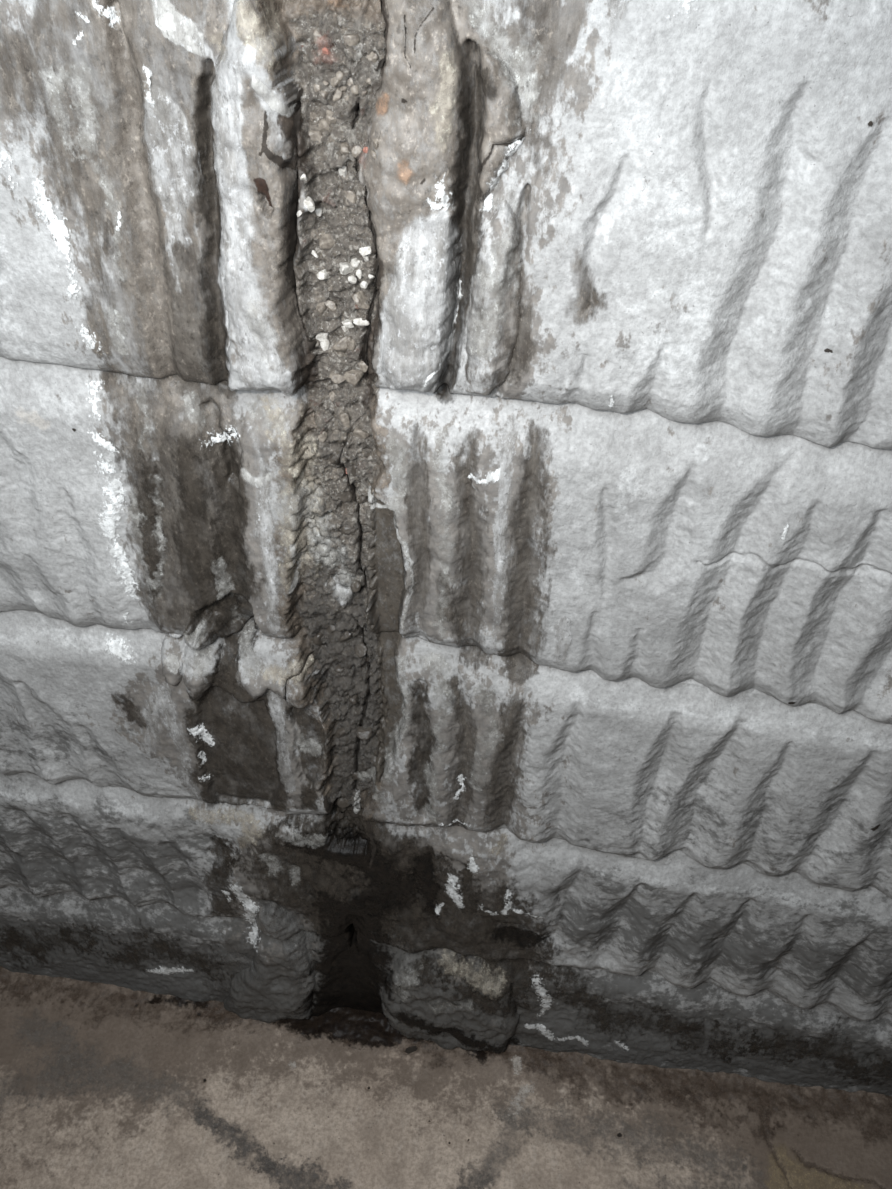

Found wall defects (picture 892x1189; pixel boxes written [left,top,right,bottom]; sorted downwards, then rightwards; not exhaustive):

crack [259,88,319,351]
crack [349,97,360,129]
crack [353,158,379,380]
crack [374,0,434,71]
damp [0,0,705,1051]
crack [285,643,327,701]
crack [323,432,377,869]
damp [391,1012,892,1140]